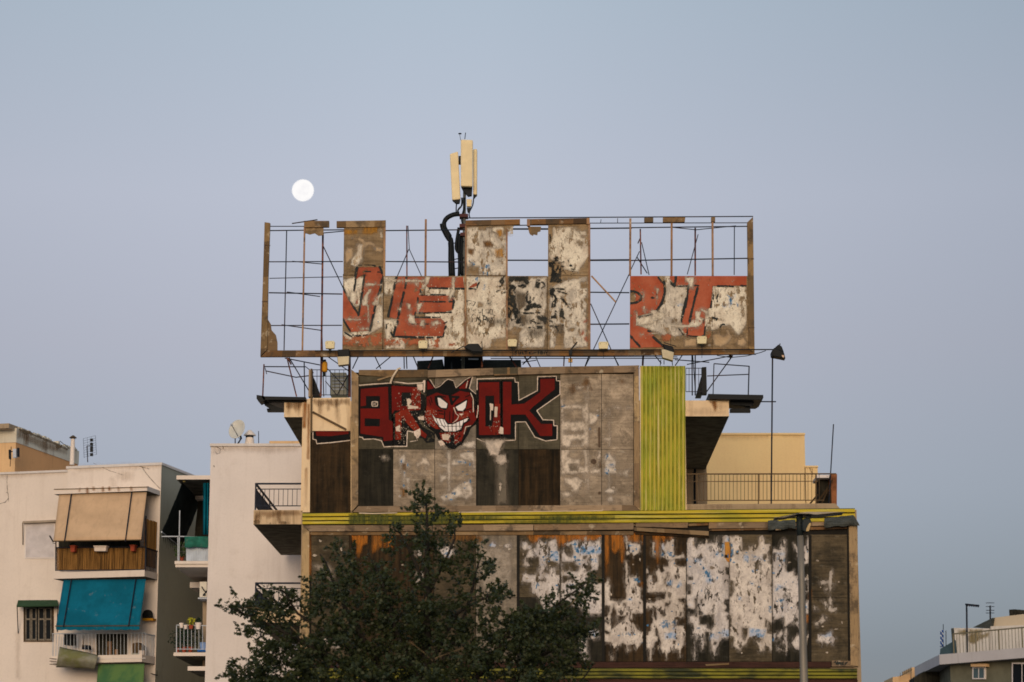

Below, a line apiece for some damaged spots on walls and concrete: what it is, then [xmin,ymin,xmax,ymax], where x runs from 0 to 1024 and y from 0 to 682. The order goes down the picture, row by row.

peeling [346,276,460,348]
peeling [634,285,711,347]
corrosion [352,535,393,553]
corrosion [529,534,673,563]
peeling [653,537,763,581]